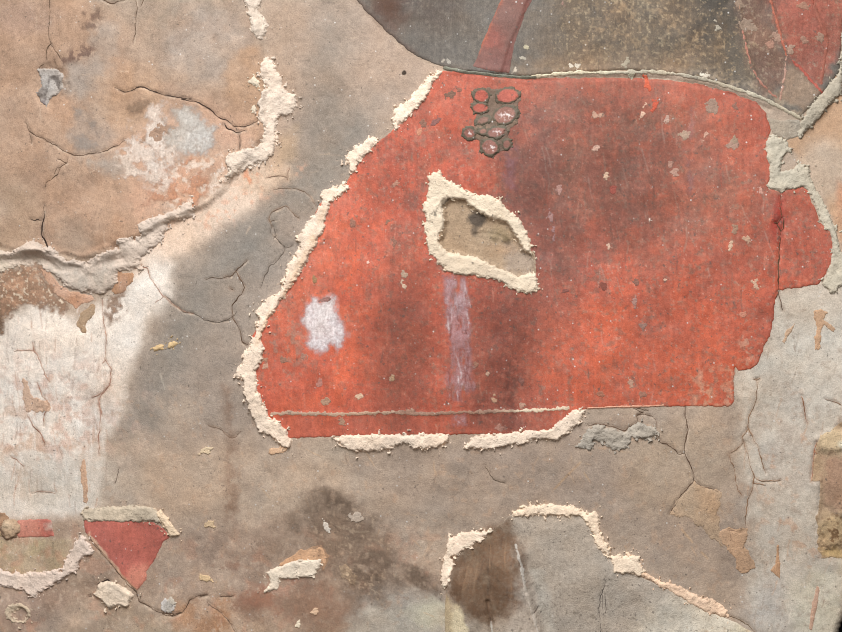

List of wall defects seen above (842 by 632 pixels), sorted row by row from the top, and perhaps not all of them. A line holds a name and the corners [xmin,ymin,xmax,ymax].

crack [39,0,60,69]
crack [117,86,257,147]
crack [26,123,125,247]
spalling [422,169,543,295]
flaking render [41,269,96,333]
flaking render [112,271,134,294]
peeling [297,296,344,360]
flaking render [22,378,51,413]
flaking render [80,459,88,503]
crack [589,378,779,536]
flaking render [279,545,330,571]
flaking render [771,545,780,578]